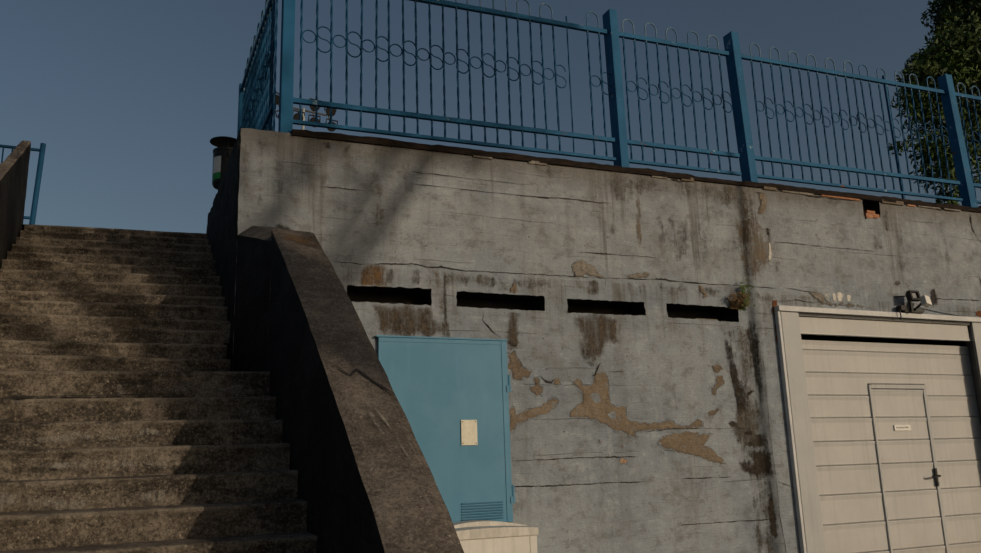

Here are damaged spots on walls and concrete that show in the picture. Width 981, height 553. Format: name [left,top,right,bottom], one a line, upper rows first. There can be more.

spalling [758,186,961,219]
water stain [374,273,494,337]
water stain [578,314,616,366]
crack [328,362,401,412]
peeling [507,349,728,467]
water stain [725,322,773,480]
water stain [757,489,777,553]